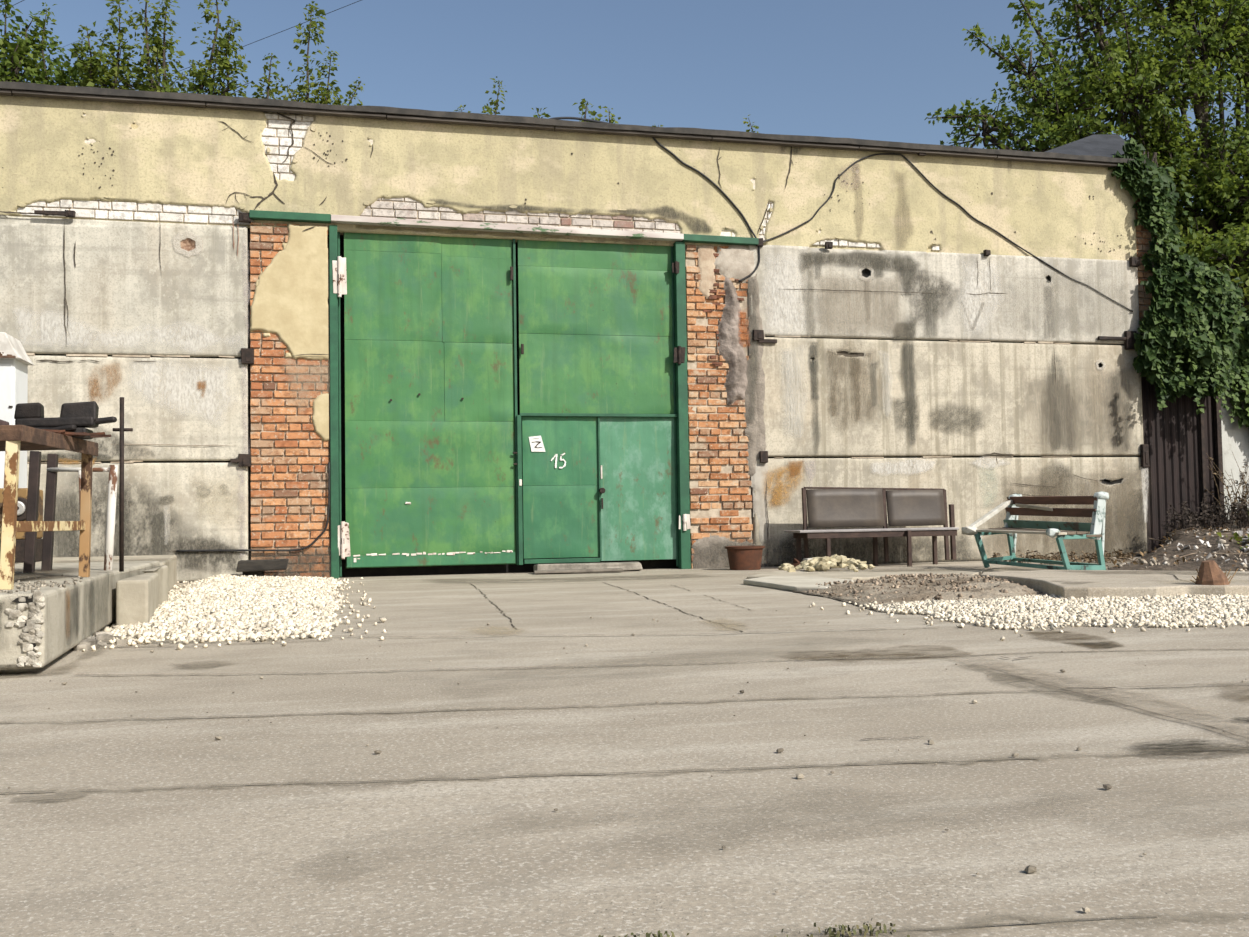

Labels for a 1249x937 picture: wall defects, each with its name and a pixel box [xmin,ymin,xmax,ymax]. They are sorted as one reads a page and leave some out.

crack [225,112,334,210]
spalling [262,113,348,181]
spalling [360,197,681,234]
flaking render [250,223,329,362]
spalling [703,253,744,312]
water stain [749,252,997,442]
flaking render [311,393,329,441]
corrosion [767,461,802,504]
spalling [4,590,45,668]